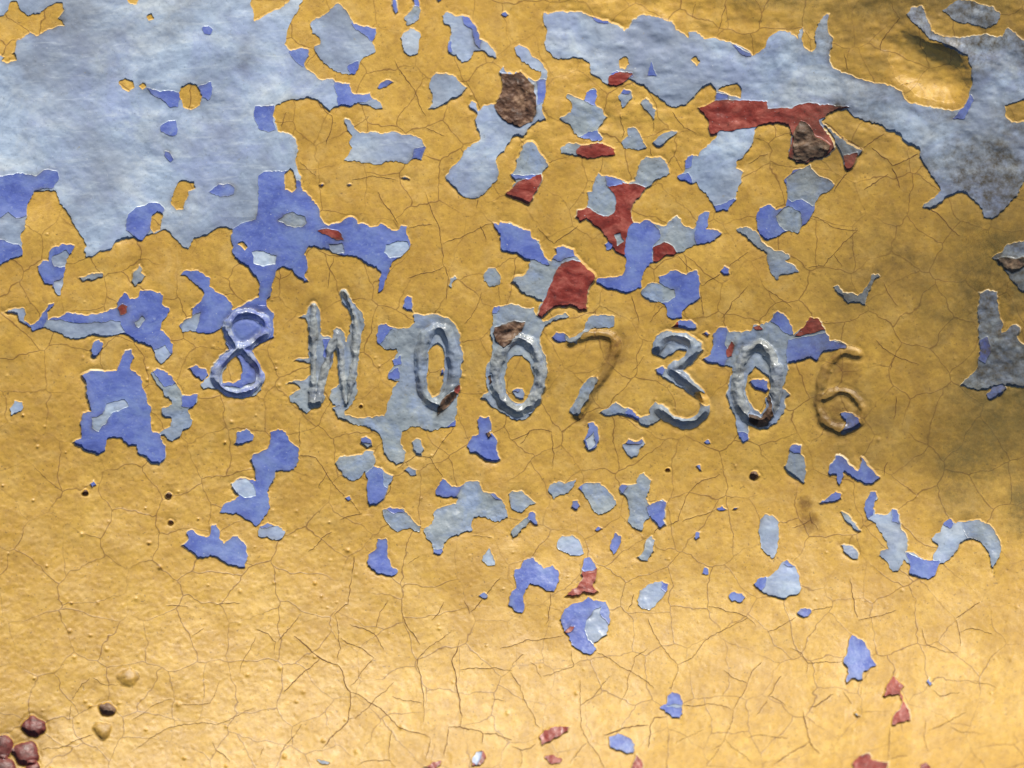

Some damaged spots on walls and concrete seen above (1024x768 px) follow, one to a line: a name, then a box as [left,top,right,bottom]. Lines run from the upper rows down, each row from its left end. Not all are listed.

crack [825,123,918,191]
peeling [0,0,426,464]
crack [354,176,488,299]
peeling [429,0,1024,462]
crack [678,252,792,317]
peeling [220,429,299,540]
crack [299,422,360,552]
peeling [288,293,538,576]
peeling [820,455,1001,579]
crack [133,561,896,767]
peeling [557,535,610,655]
crack [922,602,991,653]